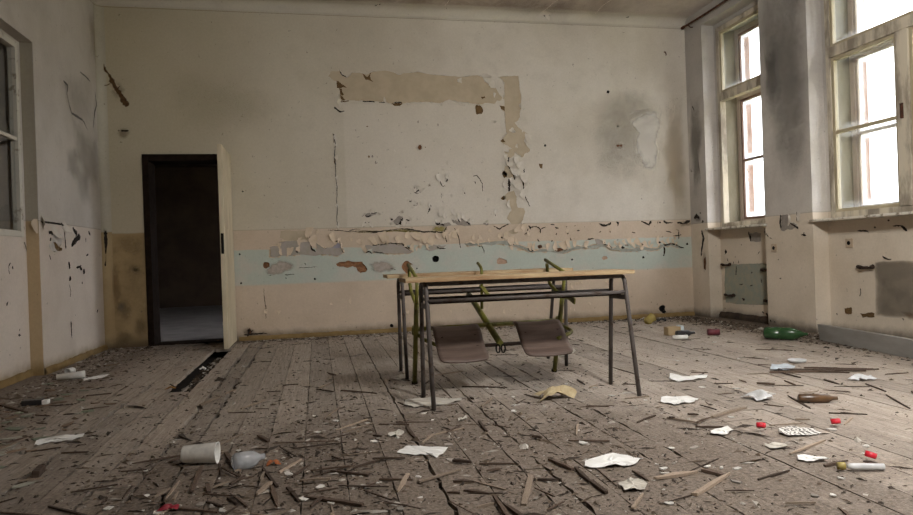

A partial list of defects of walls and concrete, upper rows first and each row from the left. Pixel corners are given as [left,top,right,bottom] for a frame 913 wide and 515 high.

peeling [263,70,684,274]
peeling [31,215,90,259]
peeling [779,212,800,231]
peeling [725,263,768,316]